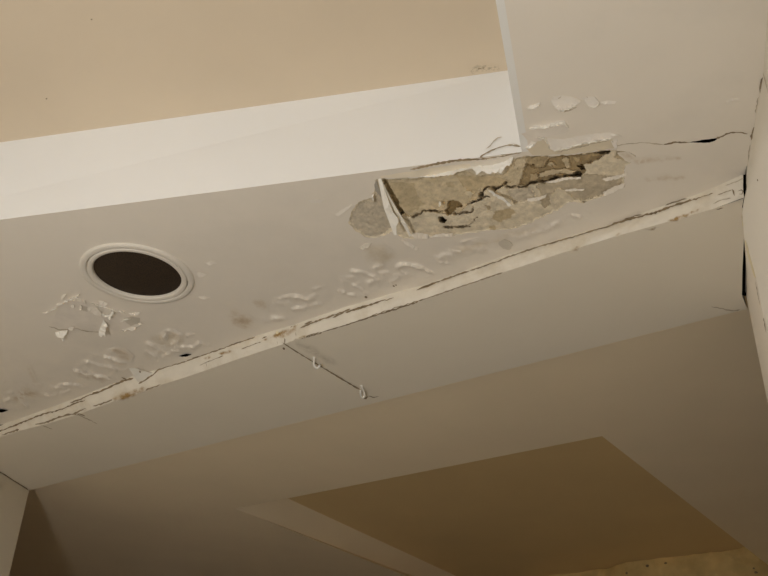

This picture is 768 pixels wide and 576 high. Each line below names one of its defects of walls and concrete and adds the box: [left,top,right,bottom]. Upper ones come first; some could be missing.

crack [0,74,768,435]
flaking render [348,95,635,250]